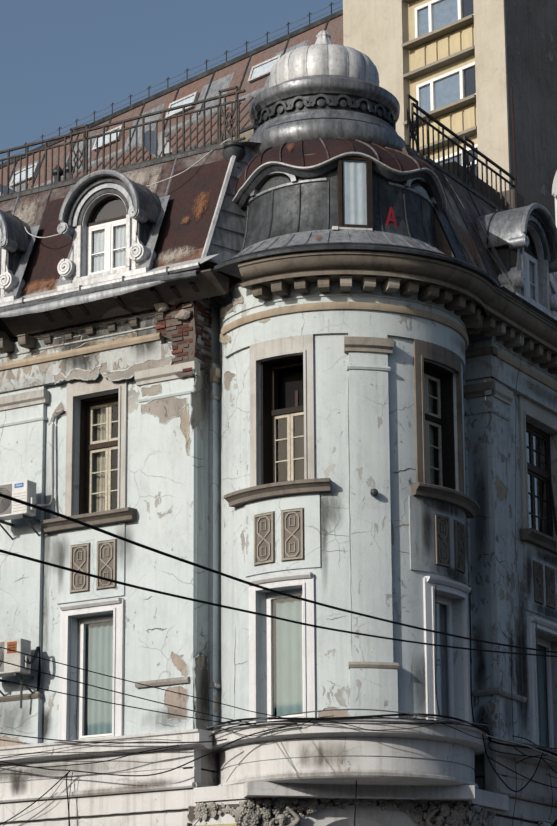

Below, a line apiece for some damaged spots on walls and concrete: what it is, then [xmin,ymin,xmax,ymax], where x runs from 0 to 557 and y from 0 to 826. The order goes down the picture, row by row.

flaking render [48,296,244,456]
crack [320,412,352,645]
spalling [163,650,219,730]